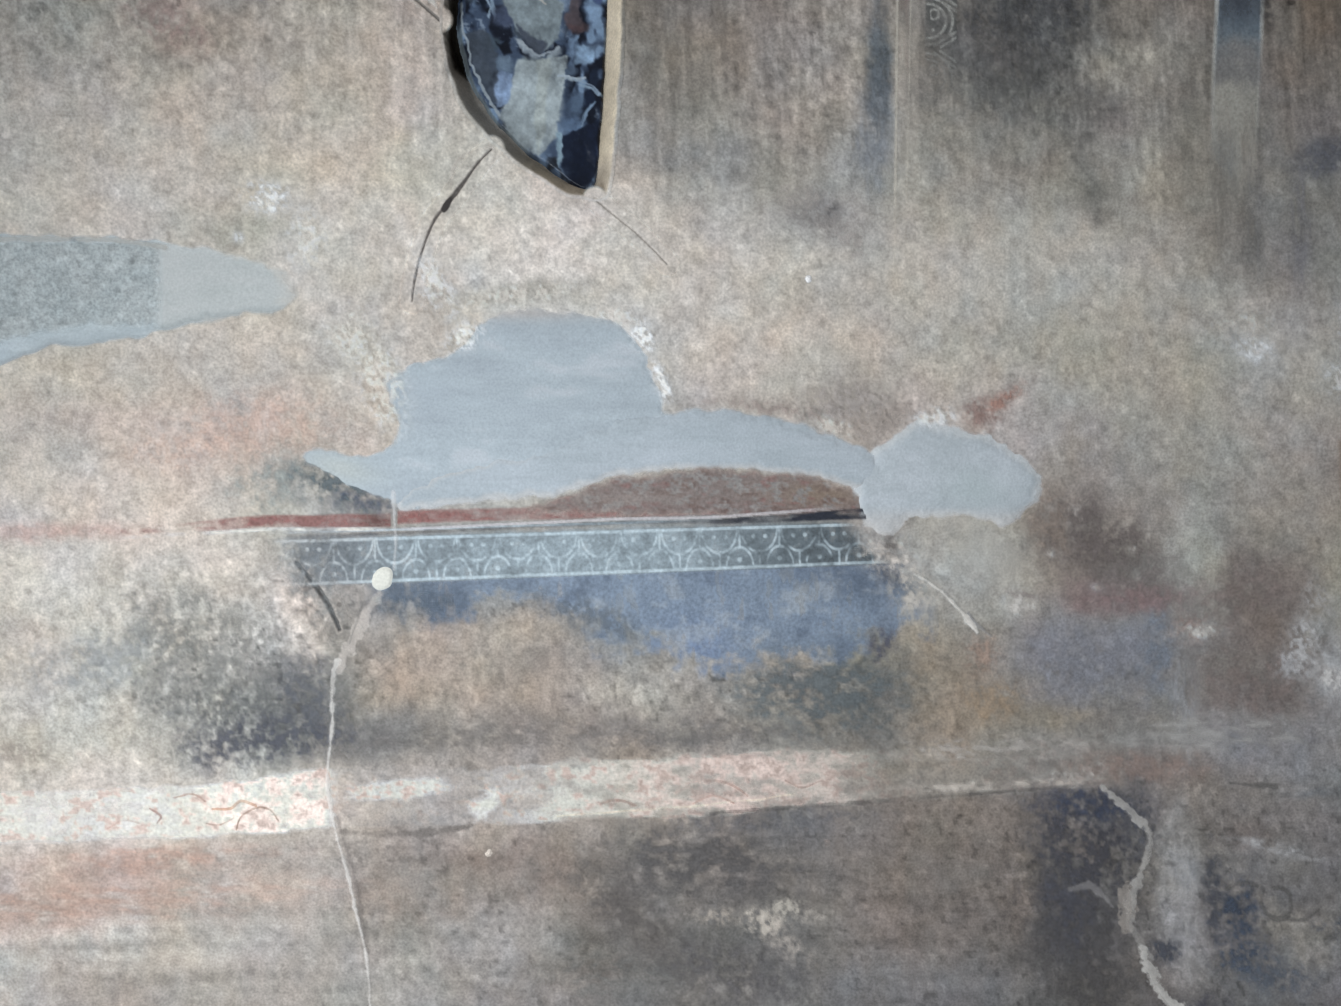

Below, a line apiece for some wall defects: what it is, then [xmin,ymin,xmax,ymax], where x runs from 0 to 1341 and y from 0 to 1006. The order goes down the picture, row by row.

crack [400,0,451,31]
spalling [439,0,626,202]
crack [400,137,503,313]
flaking render [456,325,474,349]
flaking render [631,327,653,350]
flaking render [654,366,671,397]
flaking render [921,410,945,424]
crack [283,549,352,668]
crack [325,711,333,812]
crack [1101,785,1150,889]
crack [1139,945,1147,960]
crack [1159,994,1184,1006]